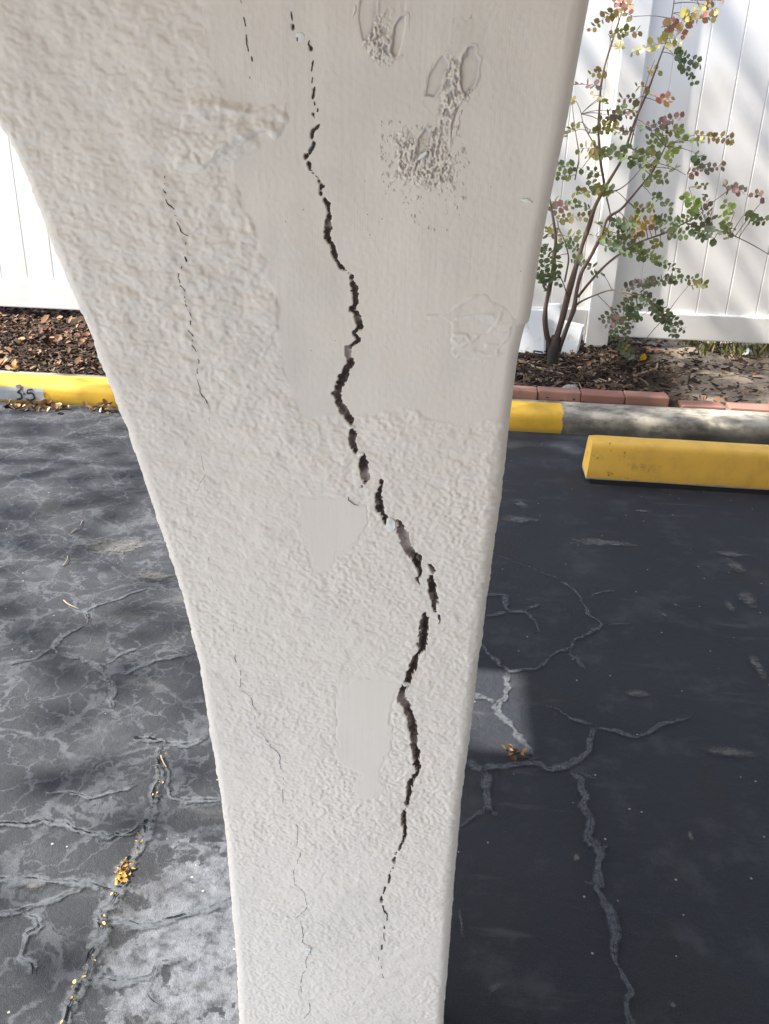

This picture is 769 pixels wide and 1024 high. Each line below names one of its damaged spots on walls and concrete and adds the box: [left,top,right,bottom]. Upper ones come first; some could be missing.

peeling [352,0,410,69]
peeling [379,0,497,232]
crack [291,12,440,976]